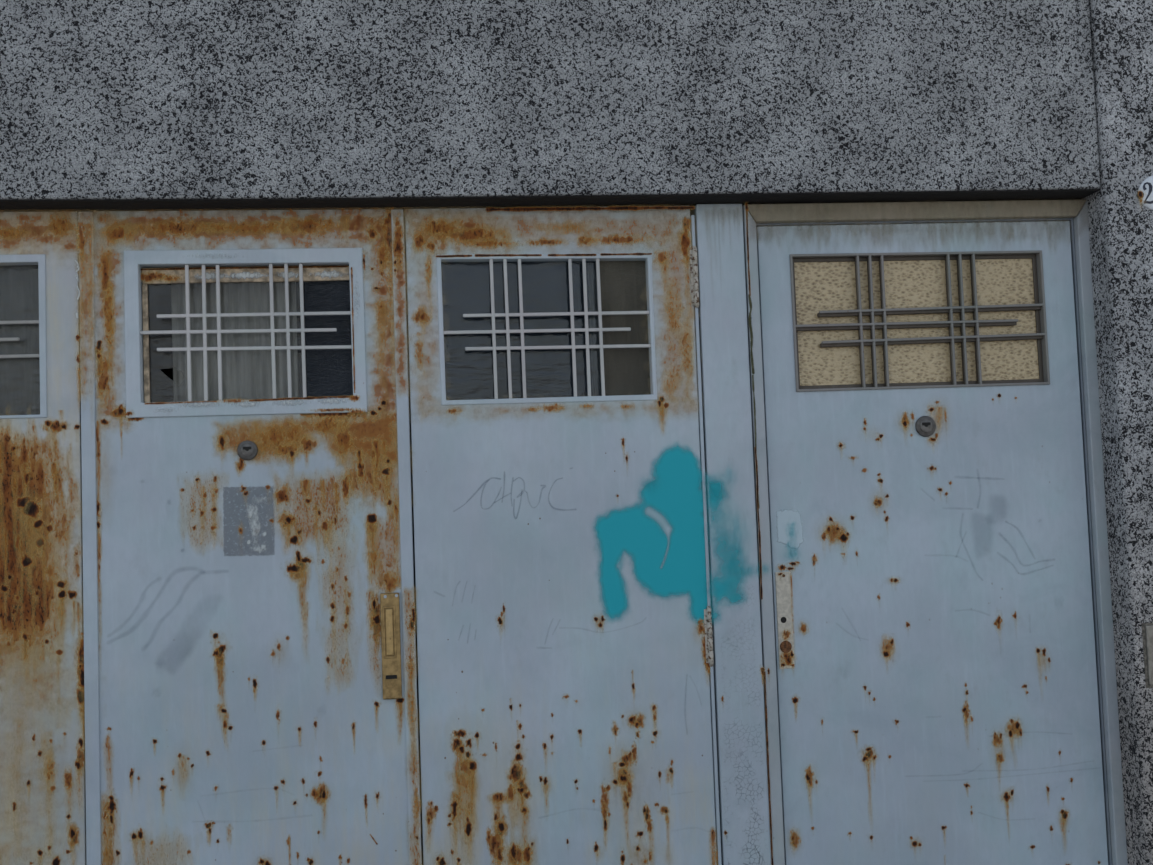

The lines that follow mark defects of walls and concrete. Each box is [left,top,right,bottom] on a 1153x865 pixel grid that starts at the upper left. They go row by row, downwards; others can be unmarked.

rust [0,206,695,734]
rust [754,447,763,600]
rust [822,516,858,556]
rust [839,443,889,522]
rust [0,410,85,865]
rust [102,727,120,865]
rust [293,756,328,816]
rust [410,730,497,865]
rust [486,723,548,865]
rust [593,705,669,865]
rust [761,573,806,865]
rust [992,719,1022,771]